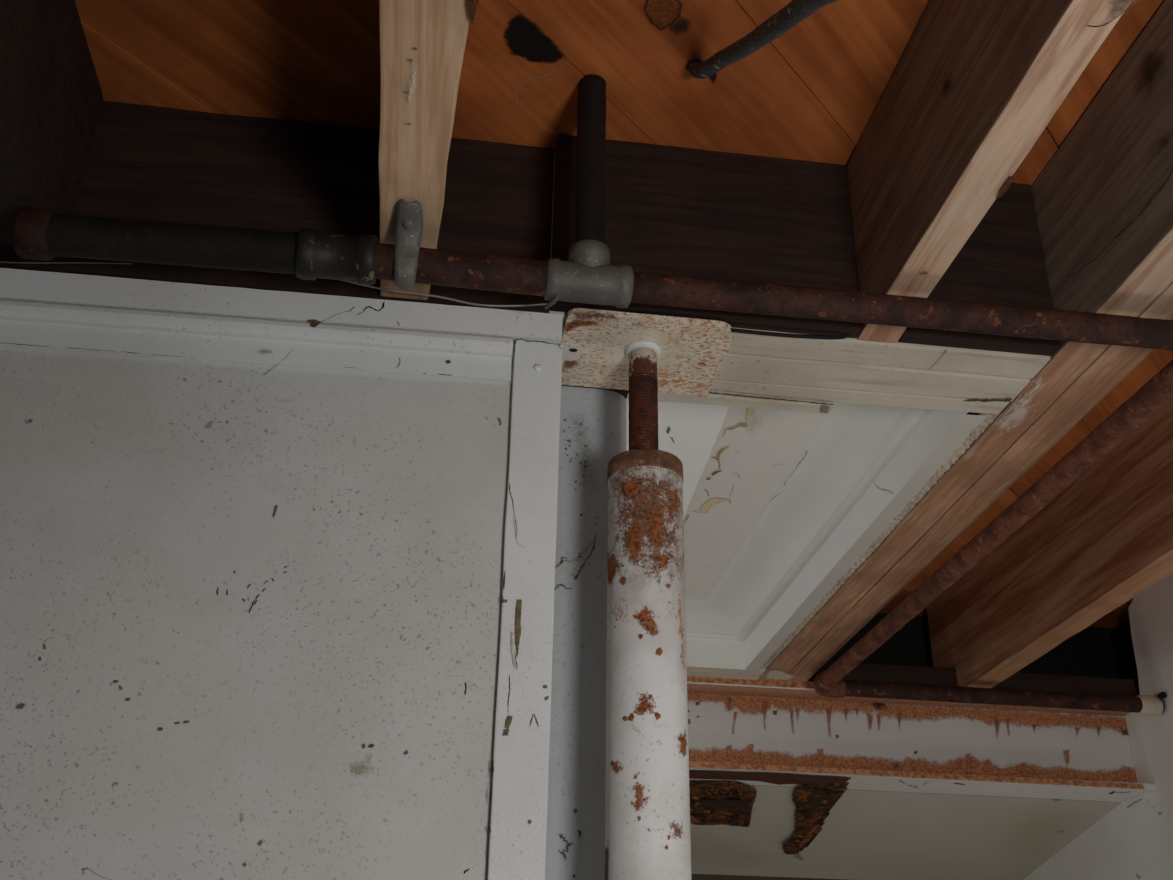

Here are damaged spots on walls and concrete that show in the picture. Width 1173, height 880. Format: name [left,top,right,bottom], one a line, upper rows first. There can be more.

rust [565,311,618,333]
peeling [694,408,754,513]
rust [607,465,683,588]
rust [612,599,663,656]
rust [622,690,661,721]
rust [677,599,1144,789]
rust [611,760,650,822]
spalling [689,770,851,855]